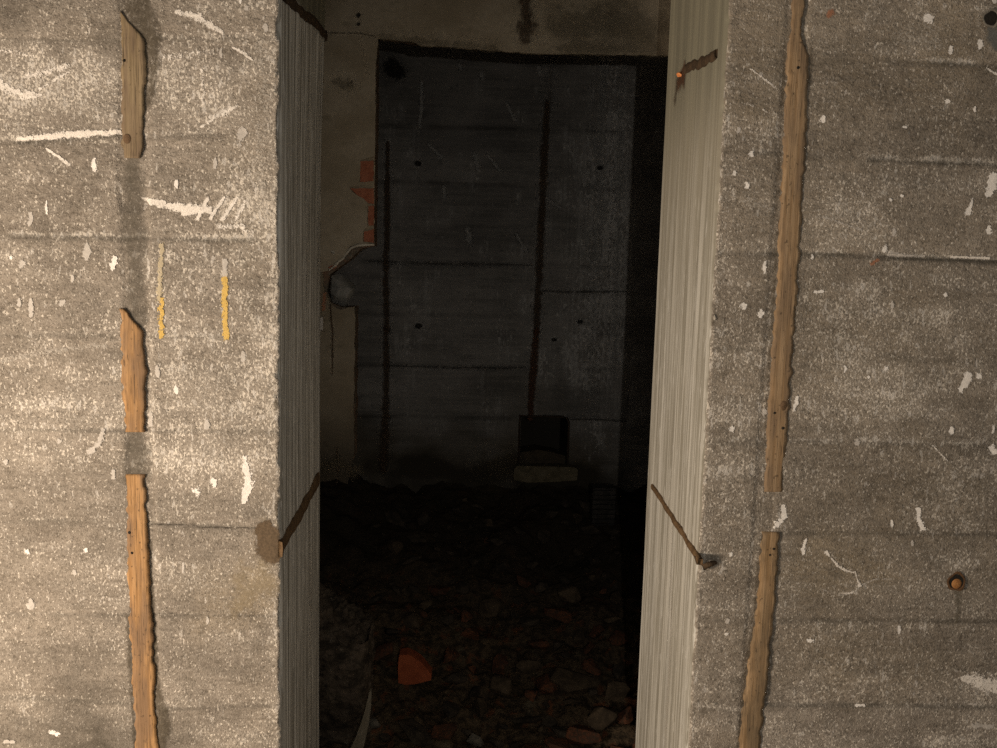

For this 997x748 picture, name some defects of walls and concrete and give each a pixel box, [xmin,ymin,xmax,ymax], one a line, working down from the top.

corrosion [674,61,685,105]
damp [155,243,165,301]
spalling [320,157,375,331]
corrosion [379,141,390,472]
corrosion [527,101,550,421]
corrosion [254,520,280,564]